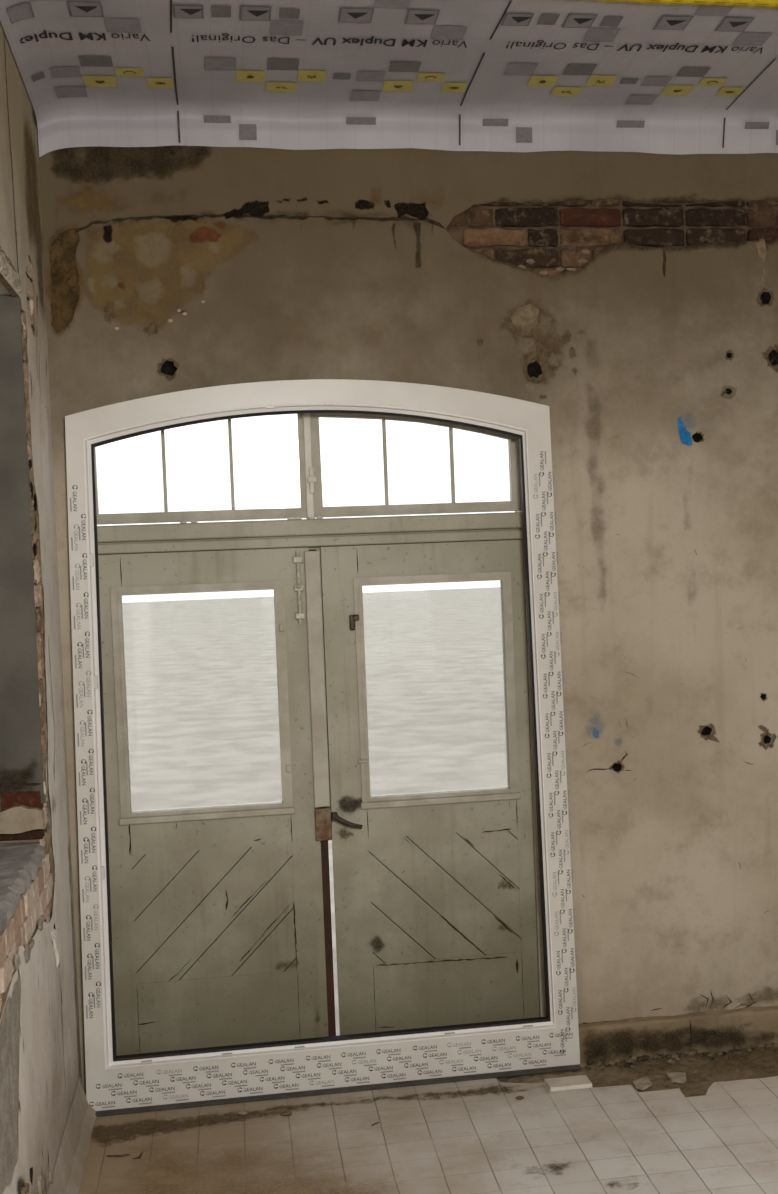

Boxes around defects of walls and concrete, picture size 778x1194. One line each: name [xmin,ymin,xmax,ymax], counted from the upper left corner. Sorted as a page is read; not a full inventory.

water stain [25,112,44,305]
flaking render [47,225,82,333]
flaking render [446,197,778,306]
spalling [525,359,544,383]
flaking render [0,246,55,1194]
water stain [585,1028,746,1060]